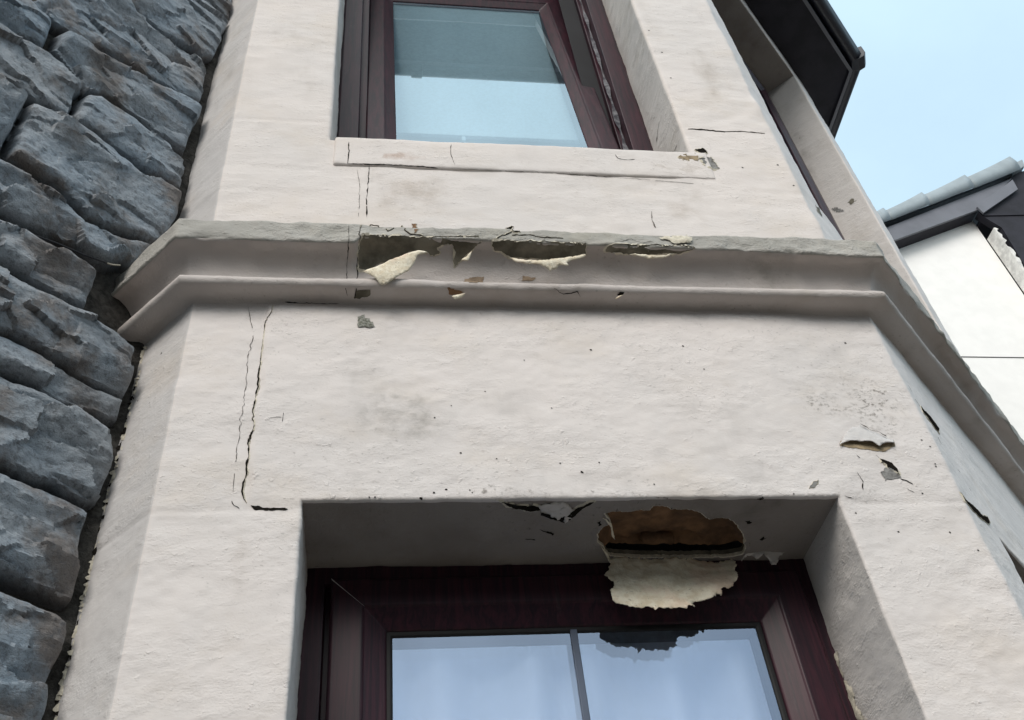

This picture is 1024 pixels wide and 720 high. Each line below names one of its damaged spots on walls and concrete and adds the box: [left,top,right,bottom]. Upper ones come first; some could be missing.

spalling [677,148,720,171]
peeling [354,224,587,299]
peeling [603,234,695,259]
crack [232,143,684,510]
peeling [839,424,912,484]
spalling [498,484,783,610]